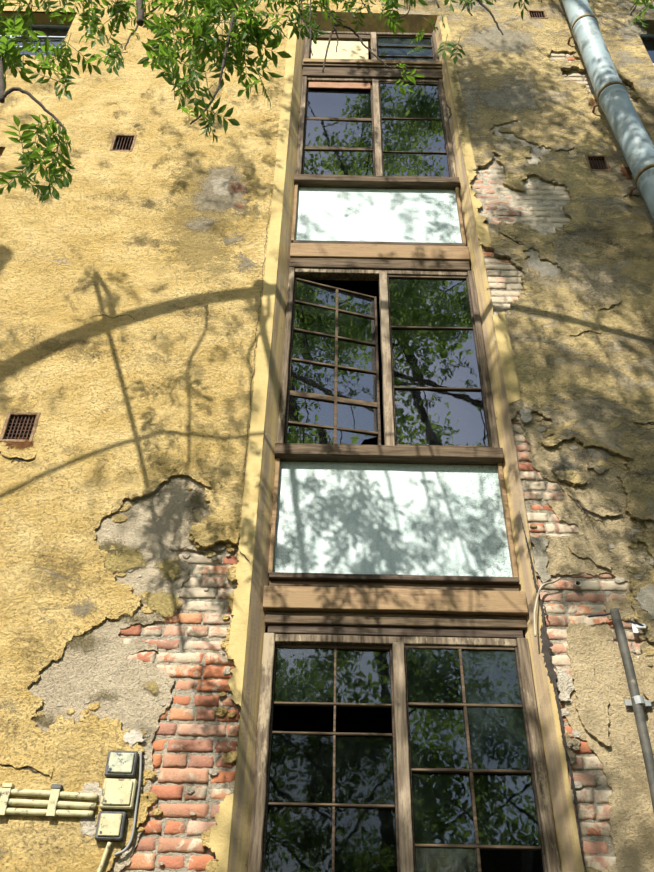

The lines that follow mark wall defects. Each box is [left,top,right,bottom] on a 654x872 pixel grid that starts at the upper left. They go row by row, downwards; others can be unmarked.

flaking render [491,121,551,165]
peeling [183,165,259,233]
flaking render [470,155,571,235]
peeling [224,233,256,270]
flaking render [482,247,562,316]
rust [4,438,34,449]
flaking render [28,466,241,872]
flaking render [511,407,654,872]
crack [0,753,54,778]